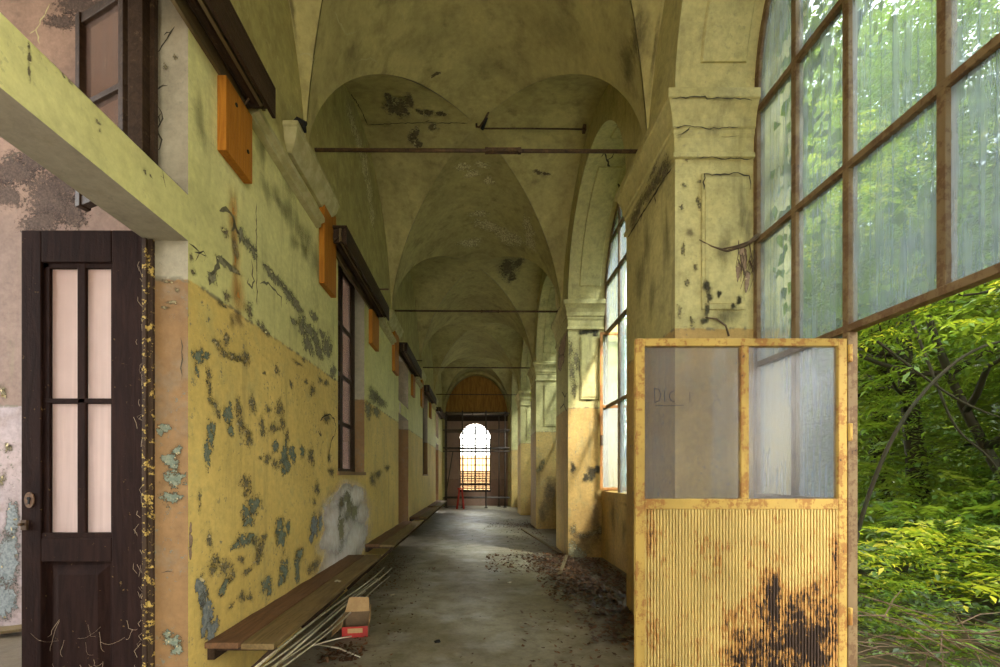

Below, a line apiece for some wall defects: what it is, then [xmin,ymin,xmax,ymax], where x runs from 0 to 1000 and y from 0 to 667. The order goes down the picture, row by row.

crack [672,94,752,102]
peeling [207,227,337,397]
mould [701,281,722,324]
peeling [191,329,315,476]
peeling [364,386,388,421]
peeling [0,497,22,622]
peeling [158,445,187,508]
peeling [195,474,323,641]
efflorescence [321,485,367,571]
peeling [337,481,359,553]